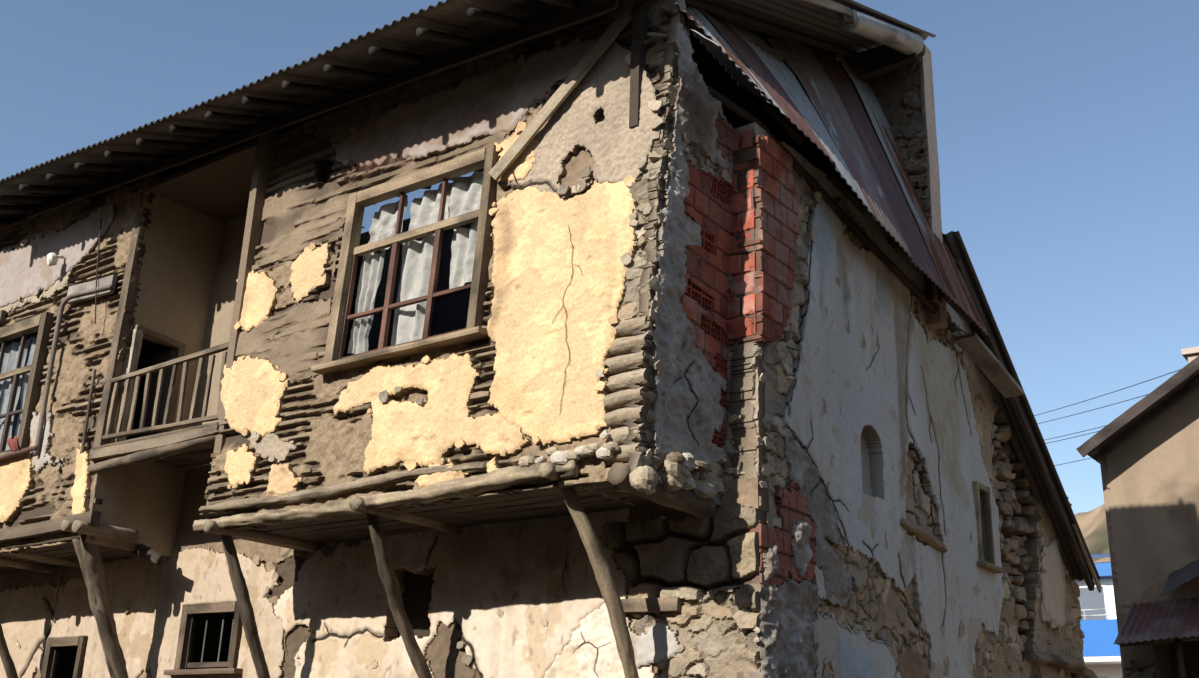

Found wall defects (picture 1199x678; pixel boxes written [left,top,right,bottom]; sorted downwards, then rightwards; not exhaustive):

peeling [0,203,117,314]
peeling [325,37,731,488]
corrosion [891,144,983,326]
peeling [0,411,92,523]
peeling [104,168,869,678]
crack [674,361,699,446]
spalling [812,271,1085,678]
peeling [0,575,110,678]
crack [312,623,398,647]
crack [454,620,482,678]